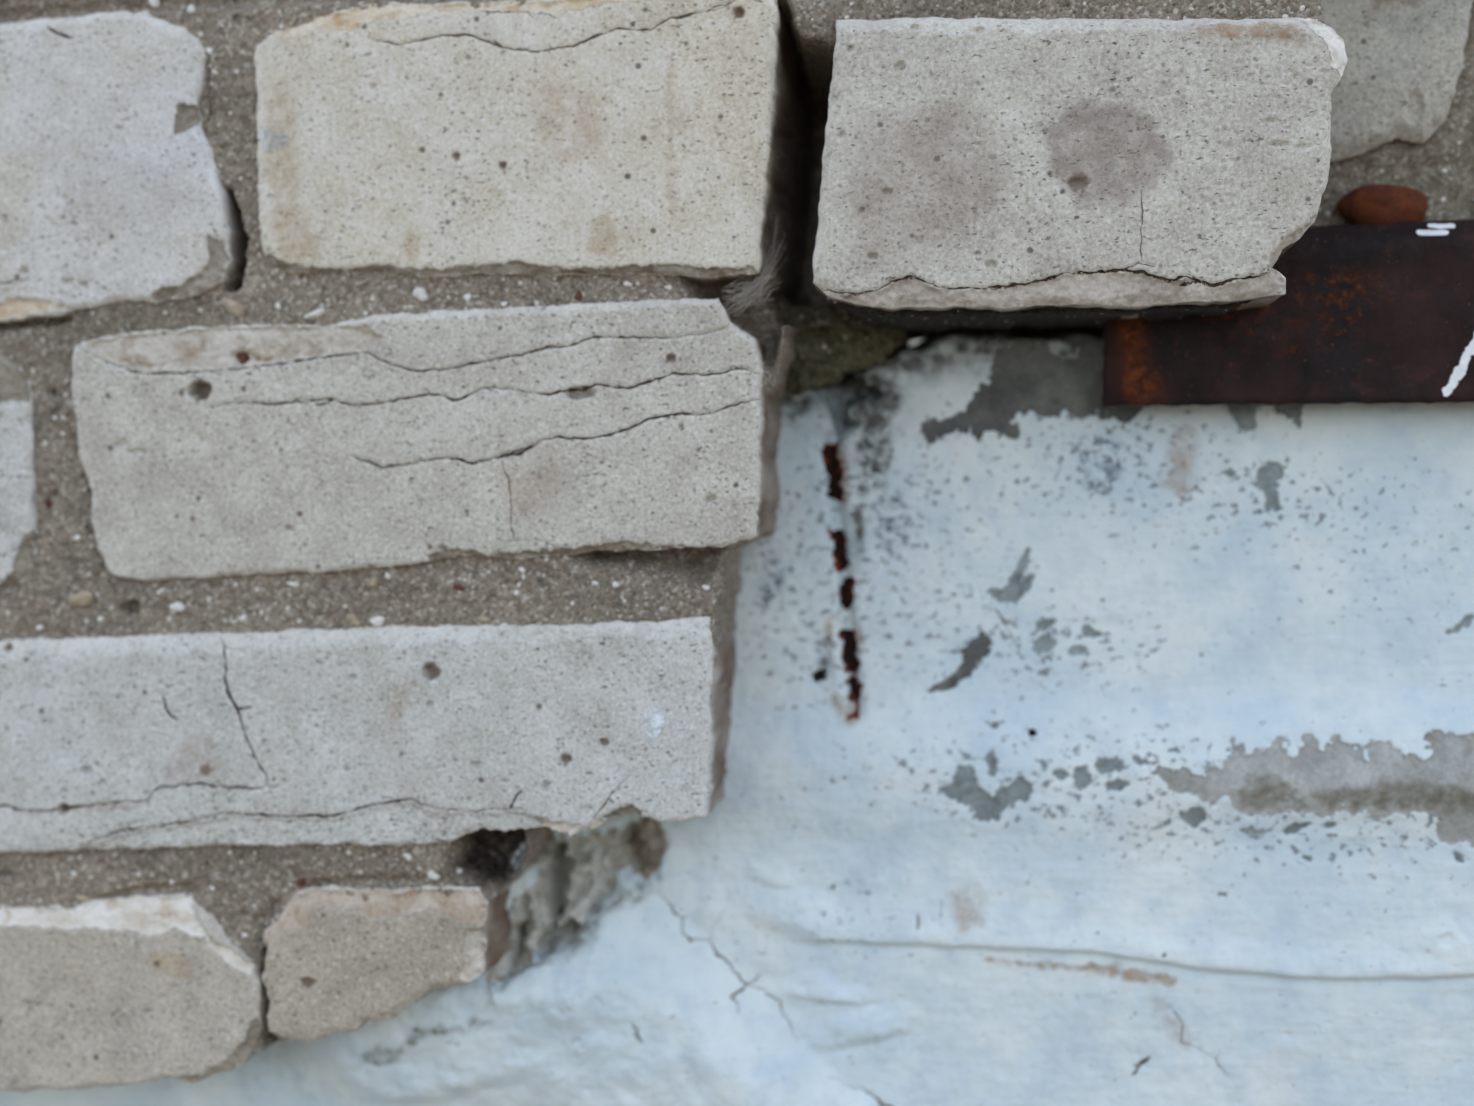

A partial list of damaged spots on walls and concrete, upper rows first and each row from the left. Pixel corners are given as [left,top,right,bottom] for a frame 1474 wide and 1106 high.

crack [368,1,734,52]
crack [77,327,760,547]
rust [821,441,847,502]
peeling [921,331,1143,449]
rust [828,529,856,611]
rust [828,627,864,722]
crack [0,638,522,849]
peeling [938,750,1035,822]
peeling [1052,729,1474,863]
spalling [0,894,255,975]
spalling [82,801,667,987]
crack [661,896,798,1042]